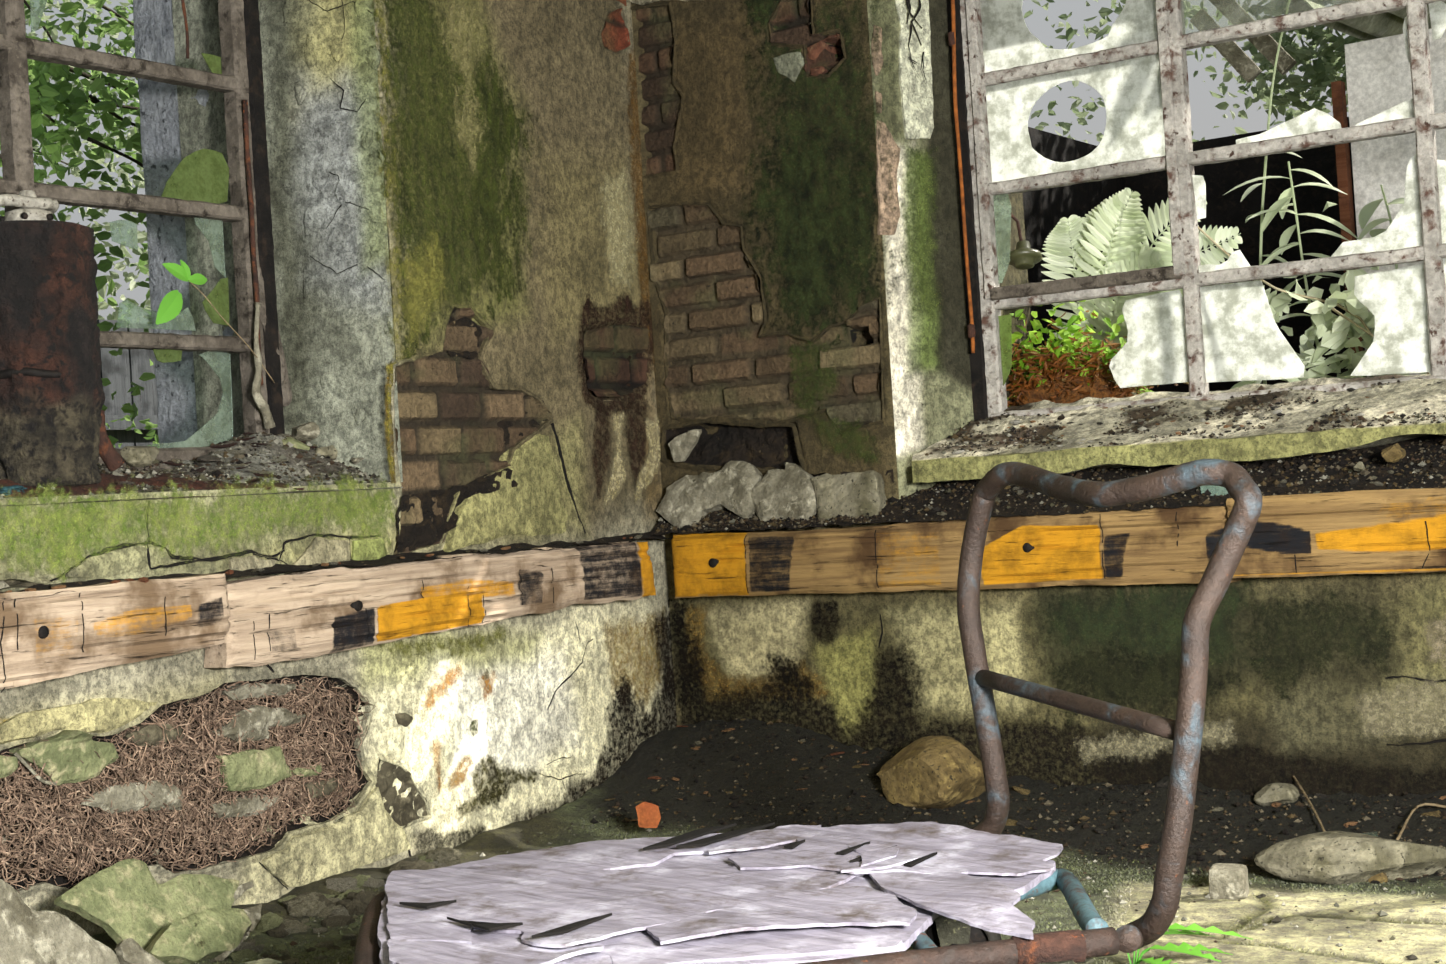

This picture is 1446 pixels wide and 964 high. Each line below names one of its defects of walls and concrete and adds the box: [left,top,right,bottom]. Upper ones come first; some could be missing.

flaking render [599,0,701,179]
flaking render [767,0,847,82]
flaking render [369,303,554,555]
flaking render [583,202,885,502]
crack [48,501,381,582]
flaking render [0,667,432,899]
damp [415,756,537,854]
damp [515,600,981,821]
damp [999,710,1172,786]
damp [1197,581,1446,797]
crack [1385,675,1446,683]
crack [1387,738,1446,746]